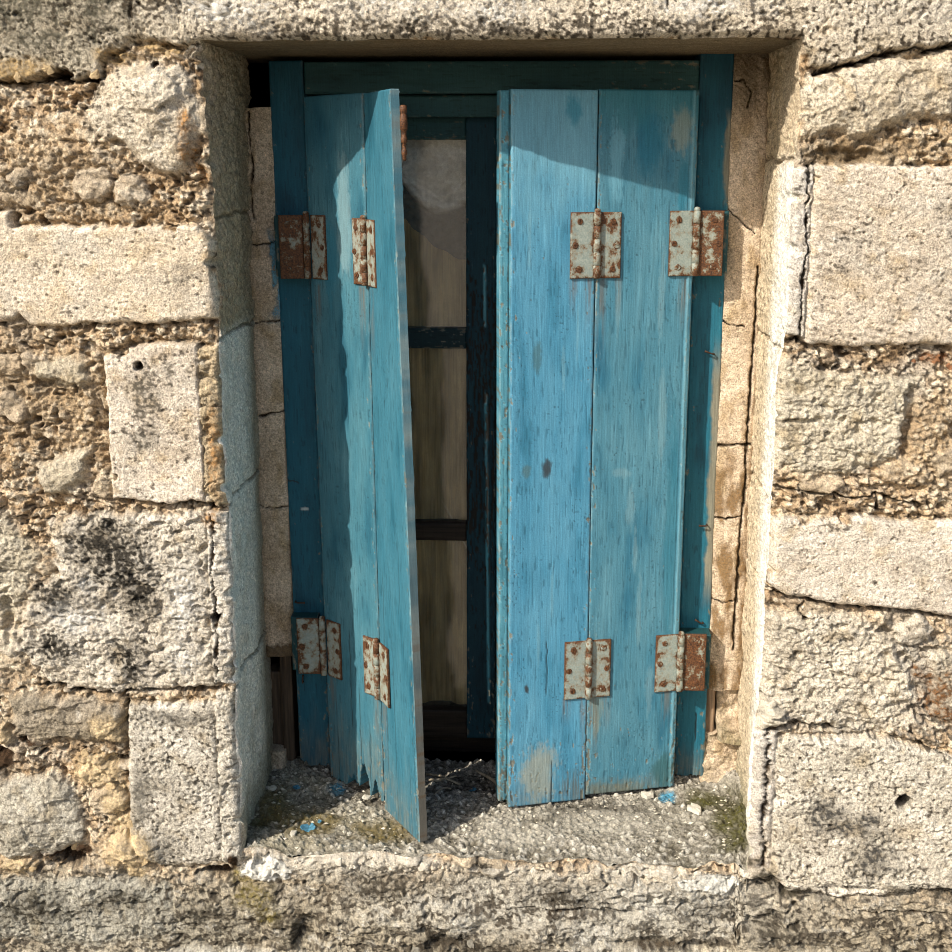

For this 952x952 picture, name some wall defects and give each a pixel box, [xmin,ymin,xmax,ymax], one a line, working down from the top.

crack [714,266,759,650]
leakage [20,515,201,674]
crack [46,681,178,717]
leakage [110,638,150,690]
crack [180,499,227,673]